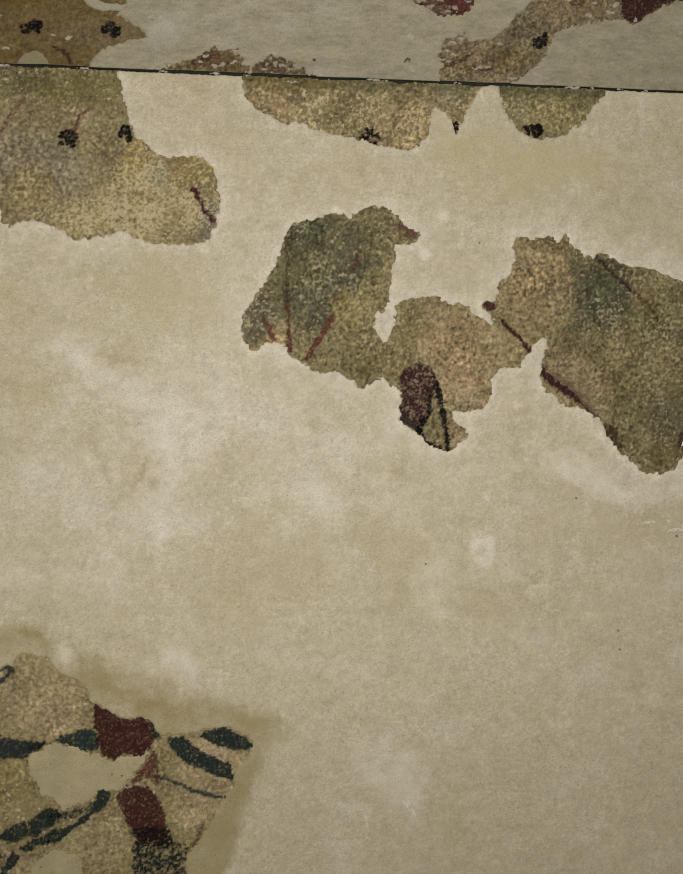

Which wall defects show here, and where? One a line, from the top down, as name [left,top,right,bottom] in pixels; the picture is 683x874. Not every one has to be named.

leakage [0,239,458,874]